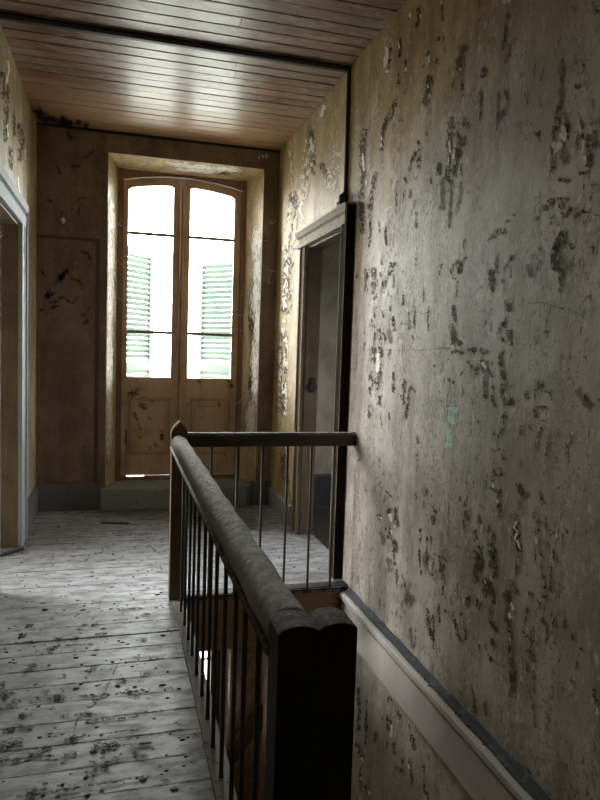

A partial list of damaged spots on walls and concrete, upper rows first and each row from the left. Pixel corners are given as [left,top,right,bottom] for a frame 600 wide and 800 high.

peeling [0,60,26,193]
leakage [33,107,89,139]
peeling [358,129,387,246]
peeling [379,37,407,151]
peeling [383,132,428,212]
flaking render [430,117,470,184]
flaking render [550,58,600,200]
peeling [245,224,266,432]
peeling [276,126,341,418]
flaking render [526,197,579,297]
peeling [418,239,574,697]
flaking render [377,491,399,583]